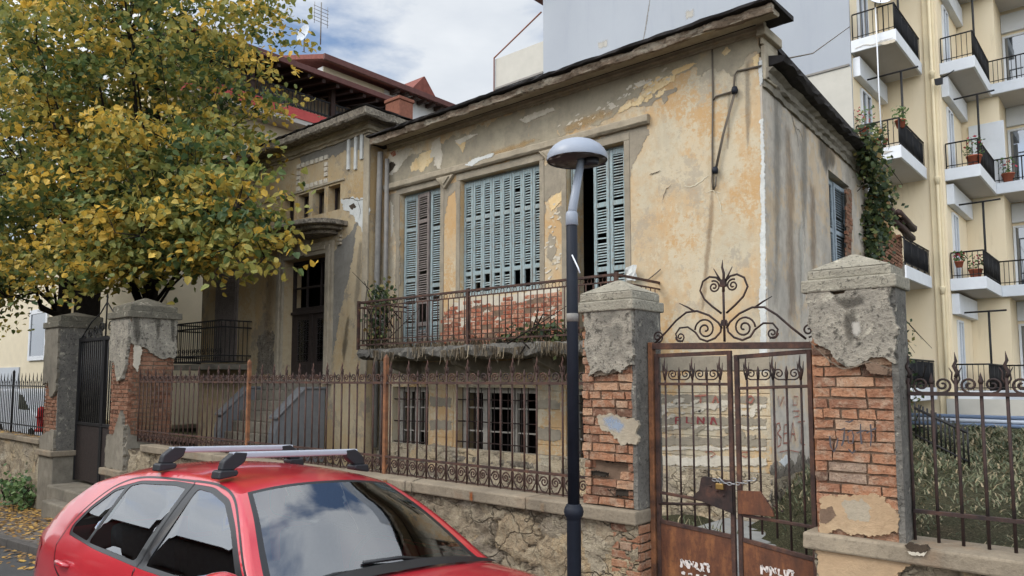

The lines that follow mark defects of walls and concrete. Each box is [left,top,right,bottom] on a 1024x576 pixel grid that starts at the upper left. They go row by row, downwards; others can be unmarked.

peeling [387,36,763,285]
spalling [440,164,562,345]
spalling [758,119,767,353]
peeling [332,196,371,362]
damp [842,298,861,340]
peeling [133,344,143,372]
spalling [809,341,889,375]
spalling [597,413,641,446]
spalling [591,460,634,497]
spalling [819,493,900,537]